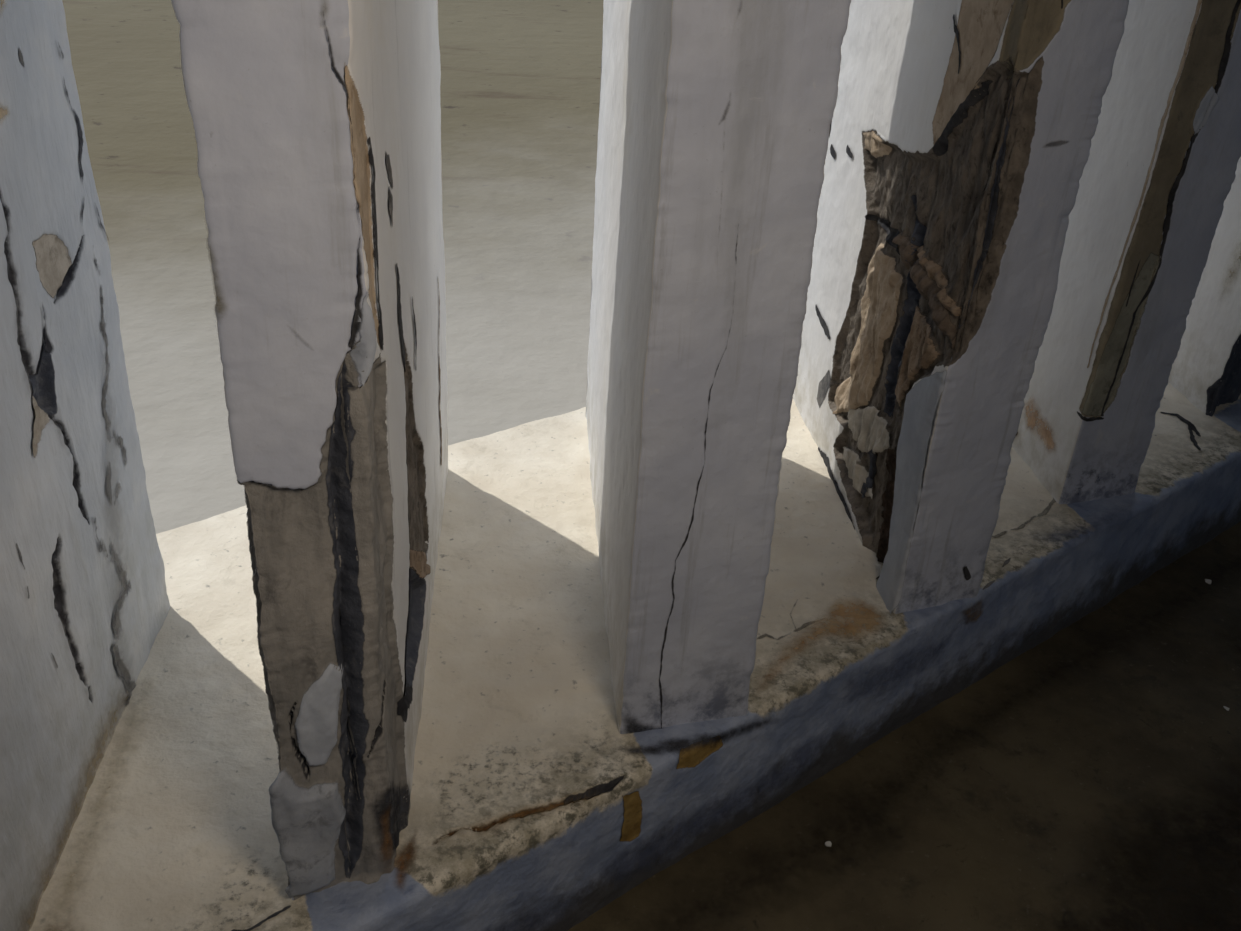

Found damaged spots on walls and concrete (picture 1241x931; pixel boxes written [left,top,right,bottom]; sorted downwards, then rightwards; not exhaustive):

spalling [32,234,83,303]
crack [0,46,136,705]
spalling [237,14,431,900]
crack [659,365,719,729]
spalling [817,0,1071,614]
spalling [1079,0,1241,418]
crack [1161,412,1201,450]
crack [435,775,624,844]